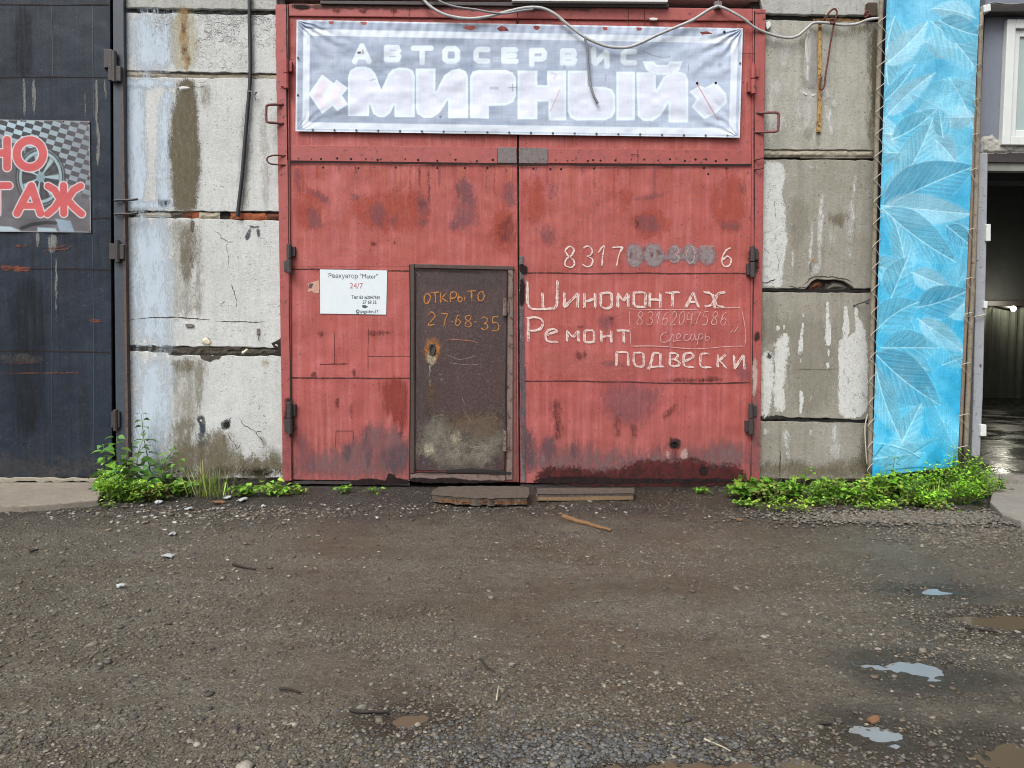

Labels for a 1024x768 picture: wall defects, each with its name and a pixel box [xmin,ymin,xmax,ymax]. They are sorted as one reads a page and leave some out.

rust [172,7,196,69]
damp [167,78,210,314]
peeling [126,9,281,475]
peeling [762,161,788,288]
spalling [803,276,851,290]
damp [170,360,314,479]
rust [425,337,441,369]
flaking render [837,306,869,419]